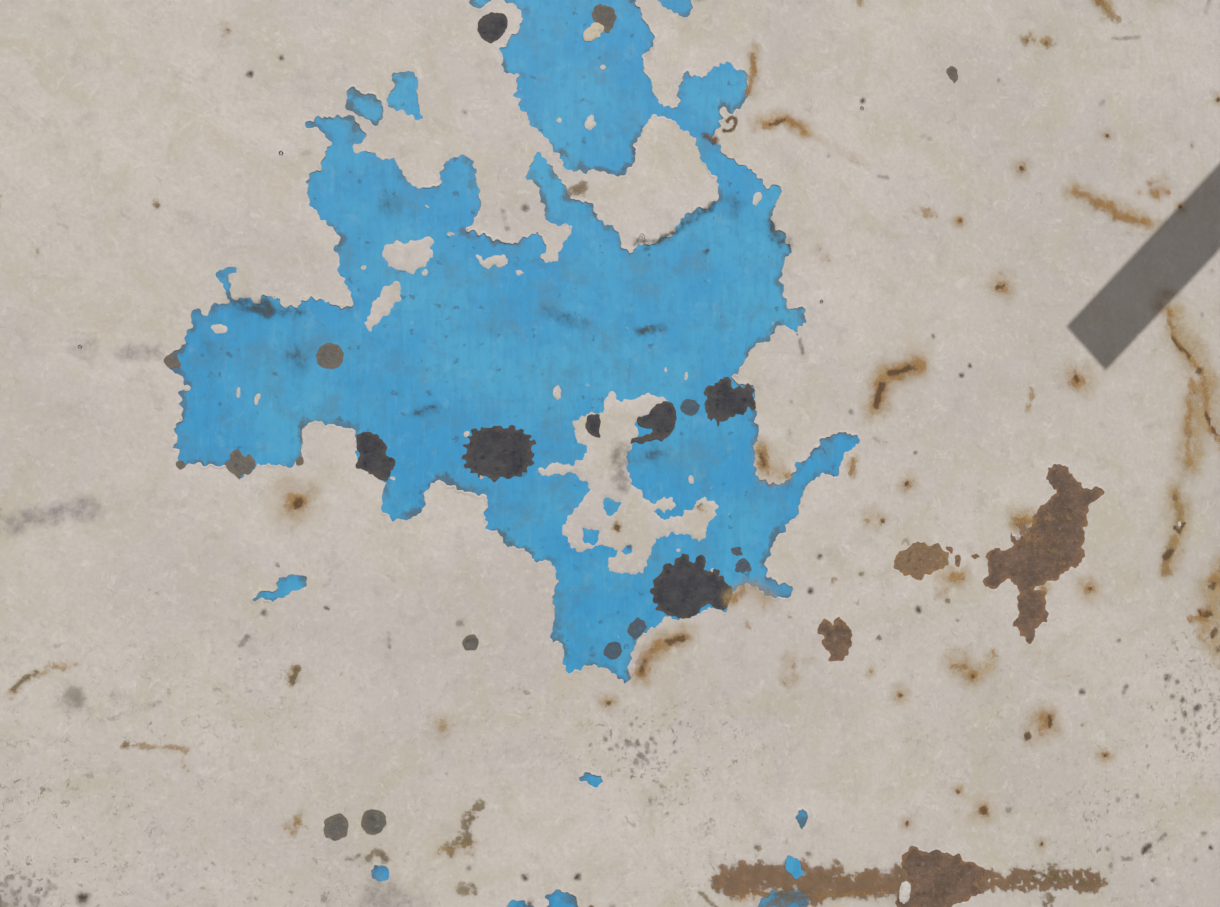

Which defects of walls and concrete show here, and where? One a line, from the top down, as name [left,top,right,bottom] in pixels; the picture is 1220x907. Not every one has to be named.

corrosion [1095,0,1120,21]
corrosion [1072,185,1149,225]
peeling [161,0,861,685]
corrosion [1168,310,1217,468]
corrosion [1012,512,1077,570]
corrosion [1162,489,1186,575]
corrosion [1188,571,1220,652]
peeling [505,888,581,907]
peeling [757,854,810,907]